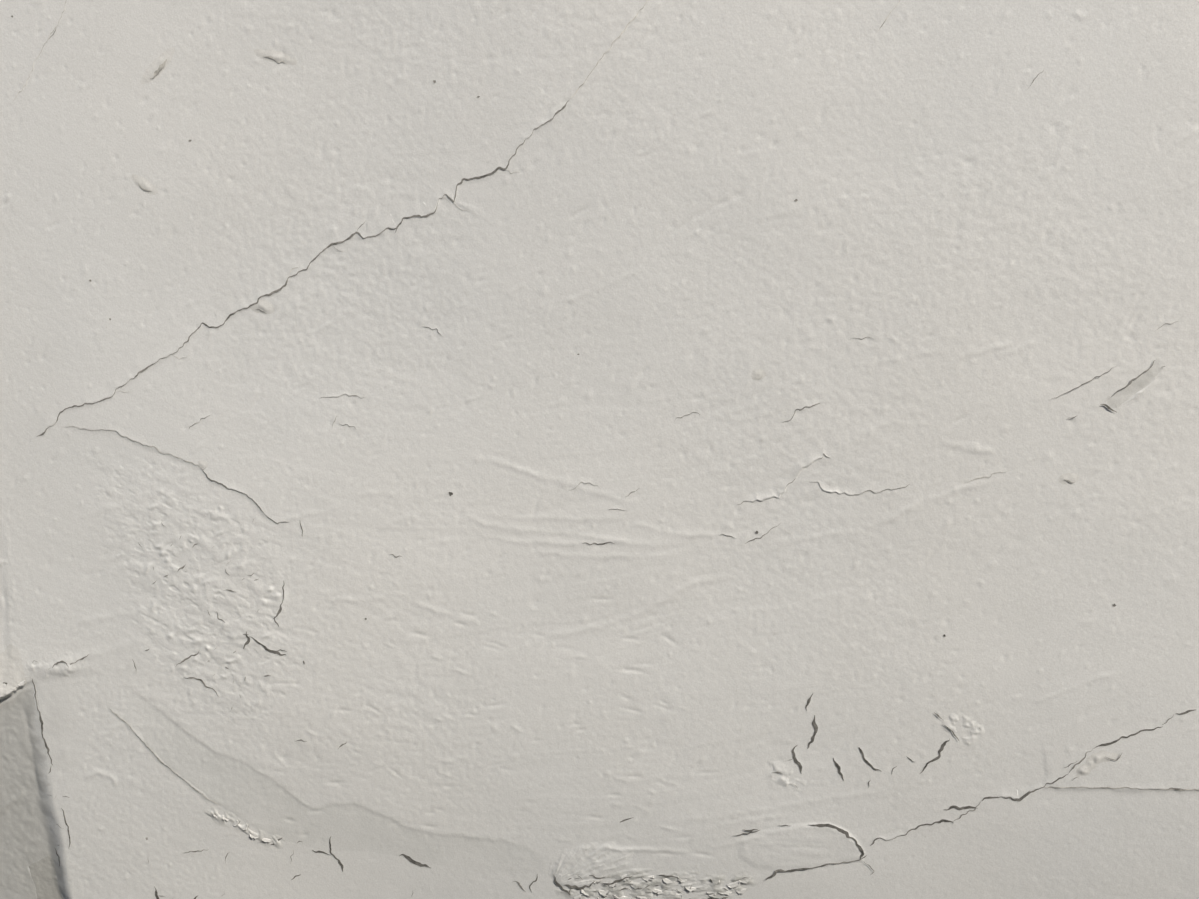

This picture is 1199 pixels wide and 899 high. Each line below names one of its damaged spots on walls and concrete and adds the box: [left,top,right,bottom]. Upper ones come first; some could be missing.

crack [34,0,649,537]
flaking render [0,644,67,899]
crack [791,693,950,788]
crack [868,710,1199,846]
flaking render [554,821,874,899]